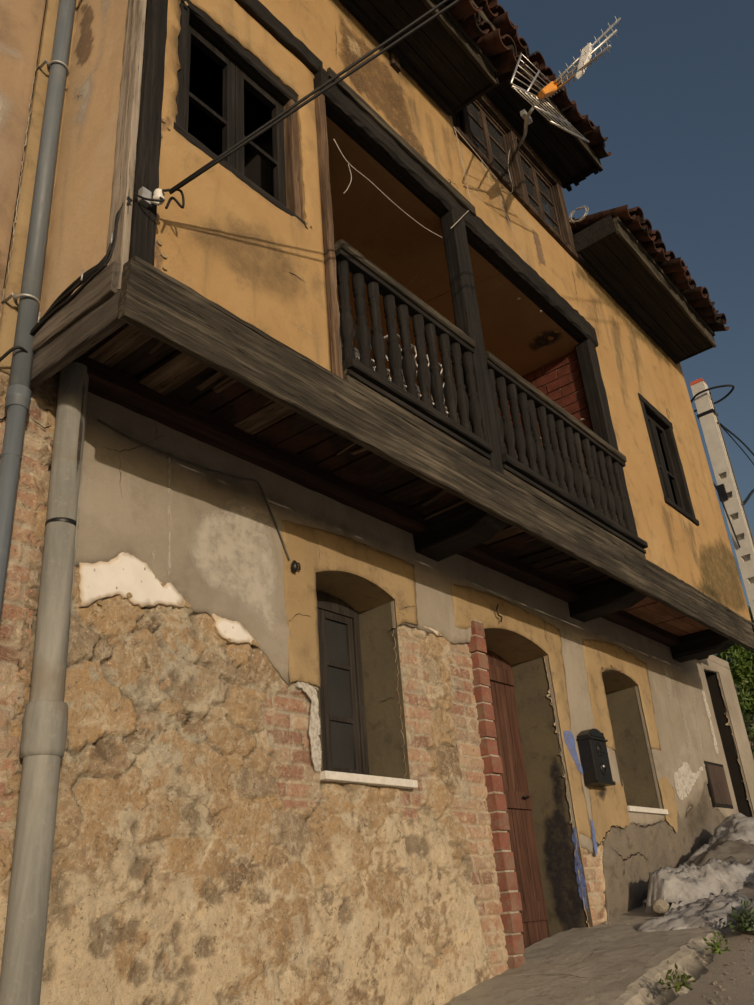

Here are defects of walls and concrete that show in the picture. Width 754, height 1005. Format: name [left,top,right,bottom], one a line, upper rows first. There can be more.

peeling [77,552,193,609]
peeling [211,614,260,647]
spalling [296,681,322,772]
spalling [674,762,705,800]
crack [598,821,663,874]